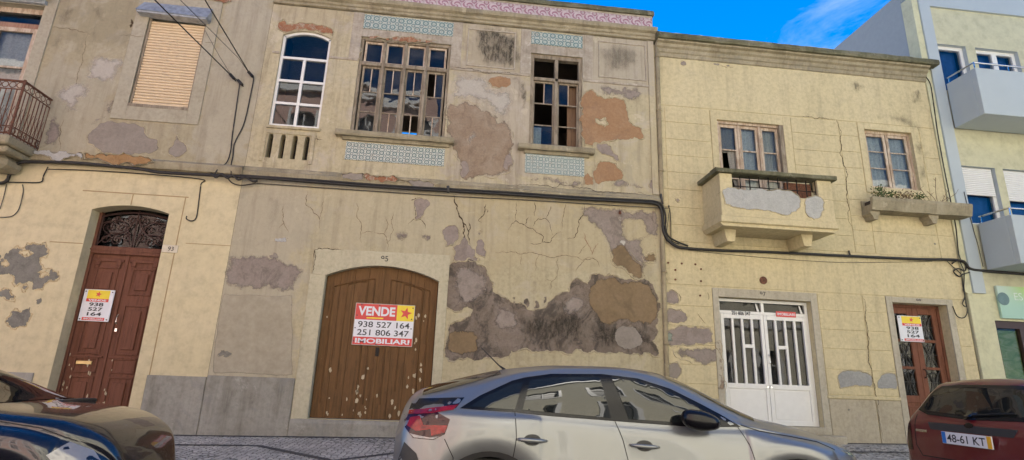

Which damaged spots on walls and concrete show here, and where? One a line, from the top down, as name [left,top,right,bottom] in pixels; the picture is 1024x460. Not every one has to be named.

water stain [480,31,516,65]
peeling [33,102,188,167]
peeling [579,87,640,118]
peeling [0,242,60,330]
peeling [226,237,300,291]
crack [282,194,426,273]
crack [454,197,488,243]
crack [496,184,650,281]
peeling [722,187,825,220]
crack [803,116,852,226]
peeling [630,289,727,393]